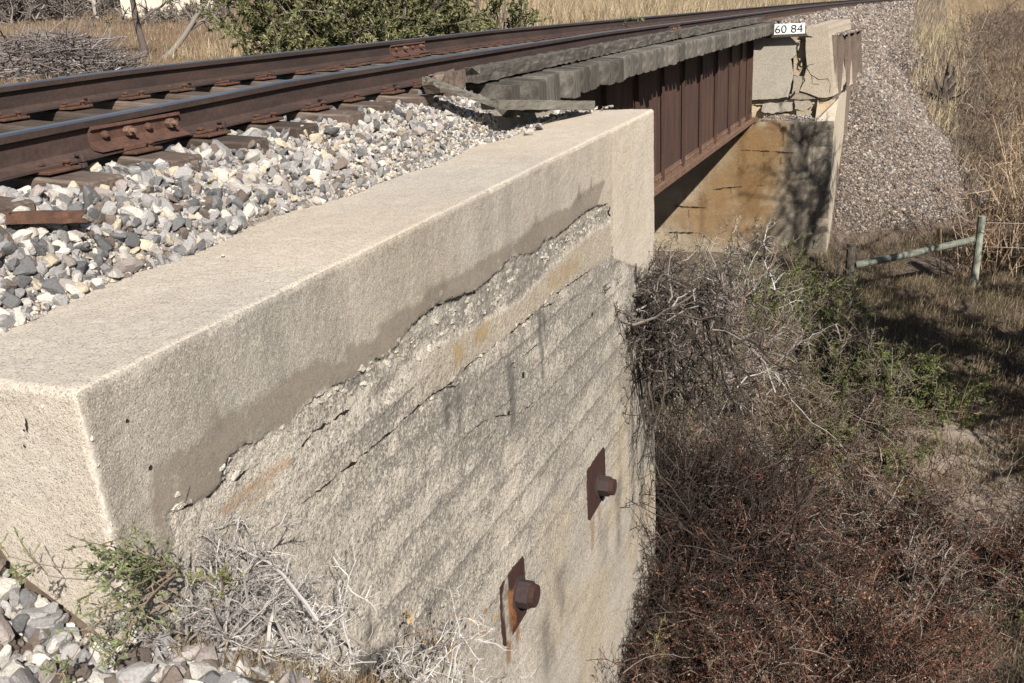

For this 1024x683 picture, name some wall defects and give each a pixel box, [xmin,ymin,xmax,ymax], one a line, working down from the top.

crack [752,35,847,102]
spalling [536,209,601,264]
water stain [154,183,603,549]
spalling [318,269,520,407]
crack [280,203,611,451]
crack [243,268,593,574]
spalling [171,491,194,512]
spalling [217,457,241,487]
rust [507,590,519,662]